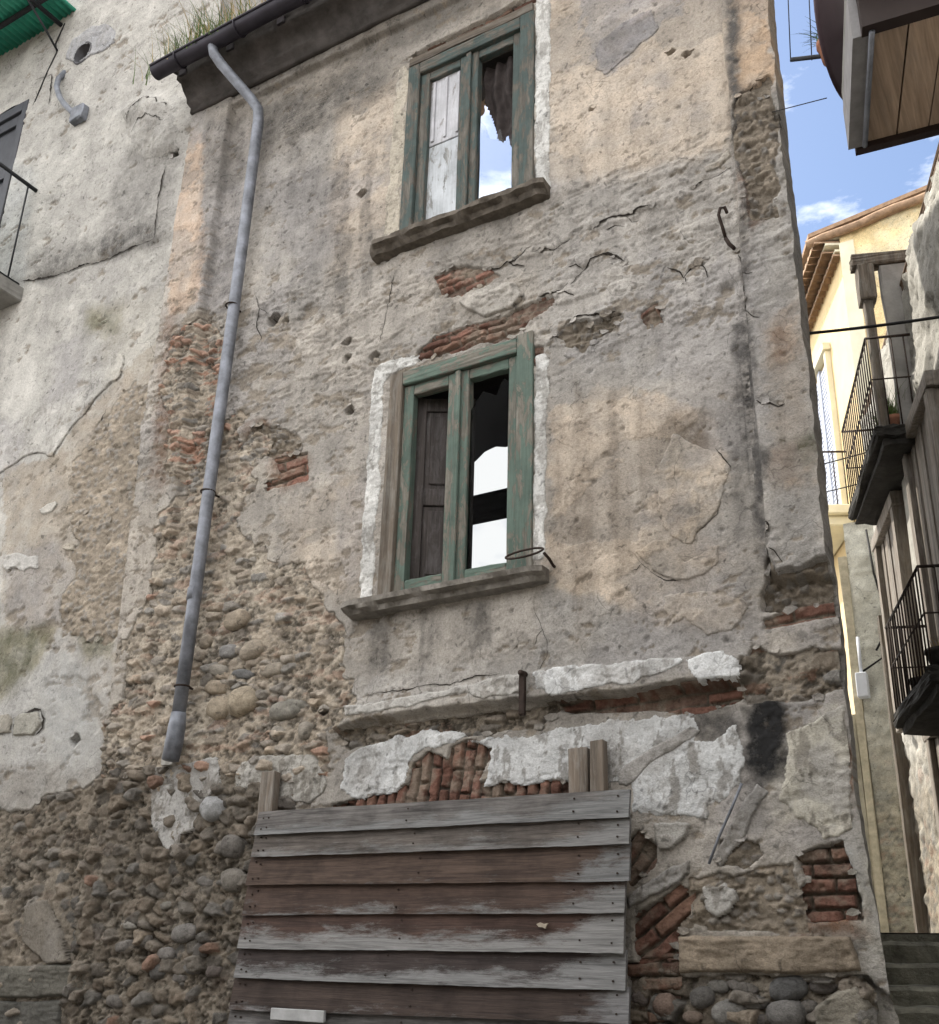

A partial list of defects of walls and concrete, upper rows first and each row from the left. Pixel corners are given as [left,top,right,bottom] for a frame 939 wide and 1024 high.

flaking render [704,77,782,221]
crack [23,170,165,281]
flaking render [434,263,500,298]
crack [488,201,656,339]
crack [667,256,709,285]
crack [734,248,756,323]
crack [363,674,495,697]
flaking render [0,297,879,1024]